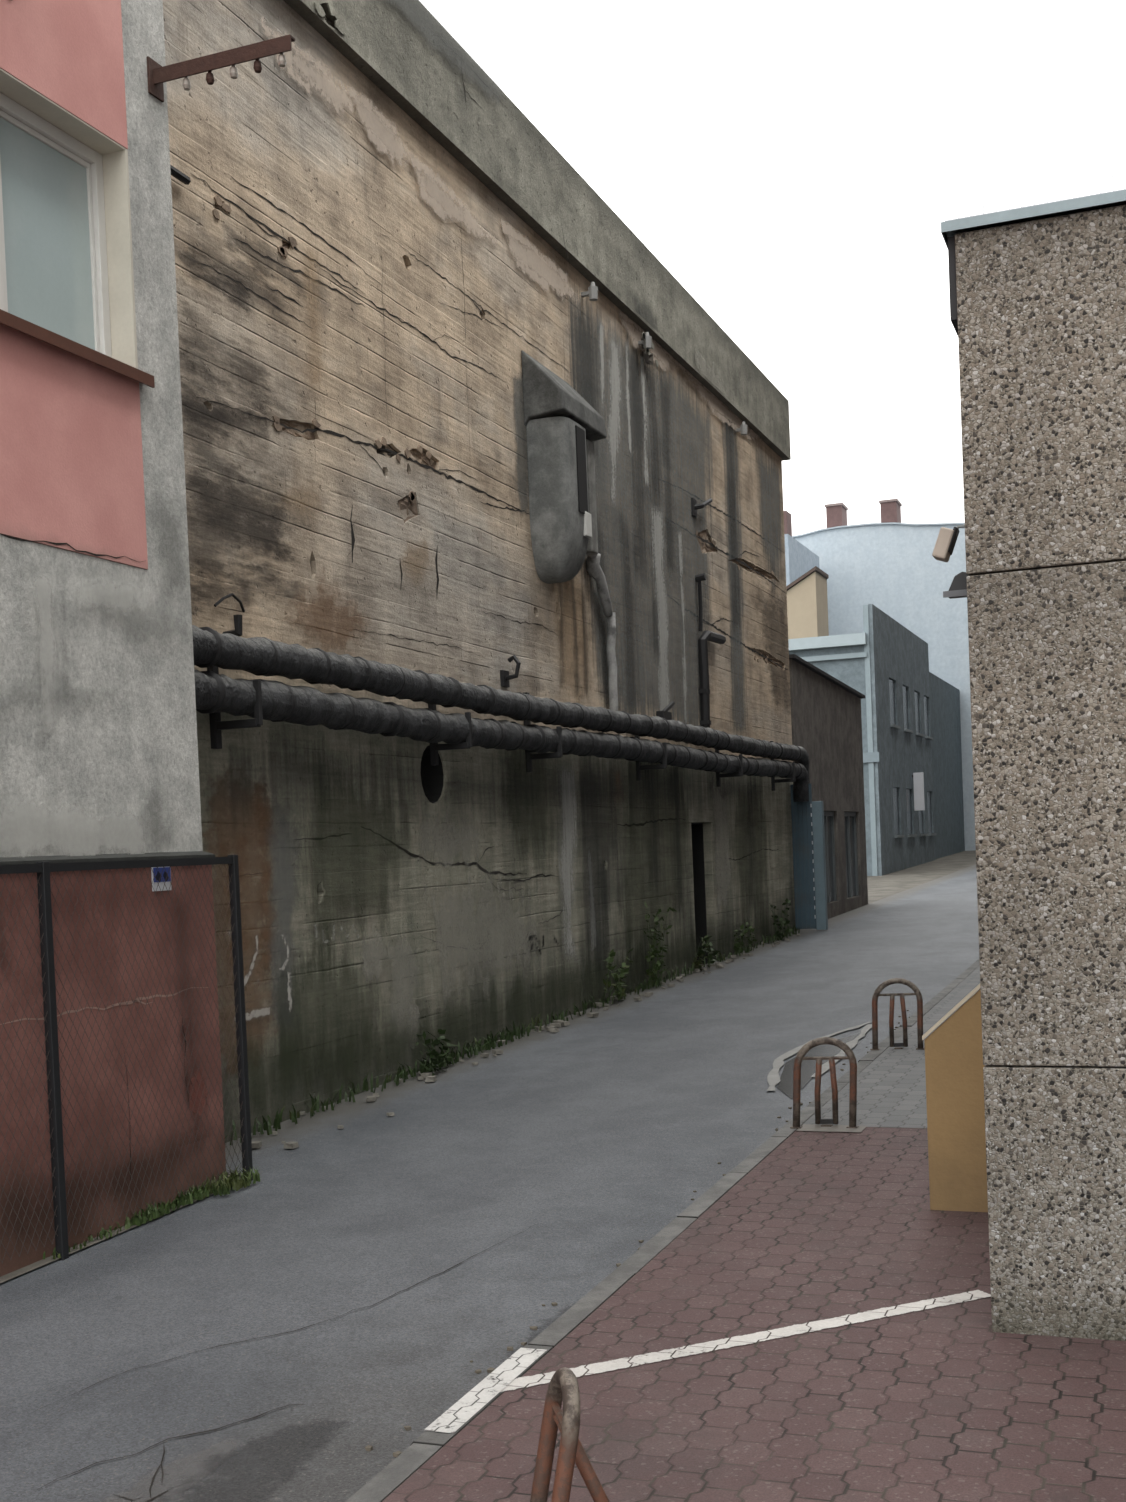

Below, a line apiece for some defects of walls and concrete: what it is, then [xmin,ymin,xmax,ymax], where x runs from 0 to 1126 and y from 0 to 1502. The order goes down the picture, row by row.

crack [192,173,576,514]
water stain [570,299,746,734]
water stain [758,453,782,573]
water stain [272,810,296,1026]
crack [294,826,572,923]
water stain [559,767,596,954]